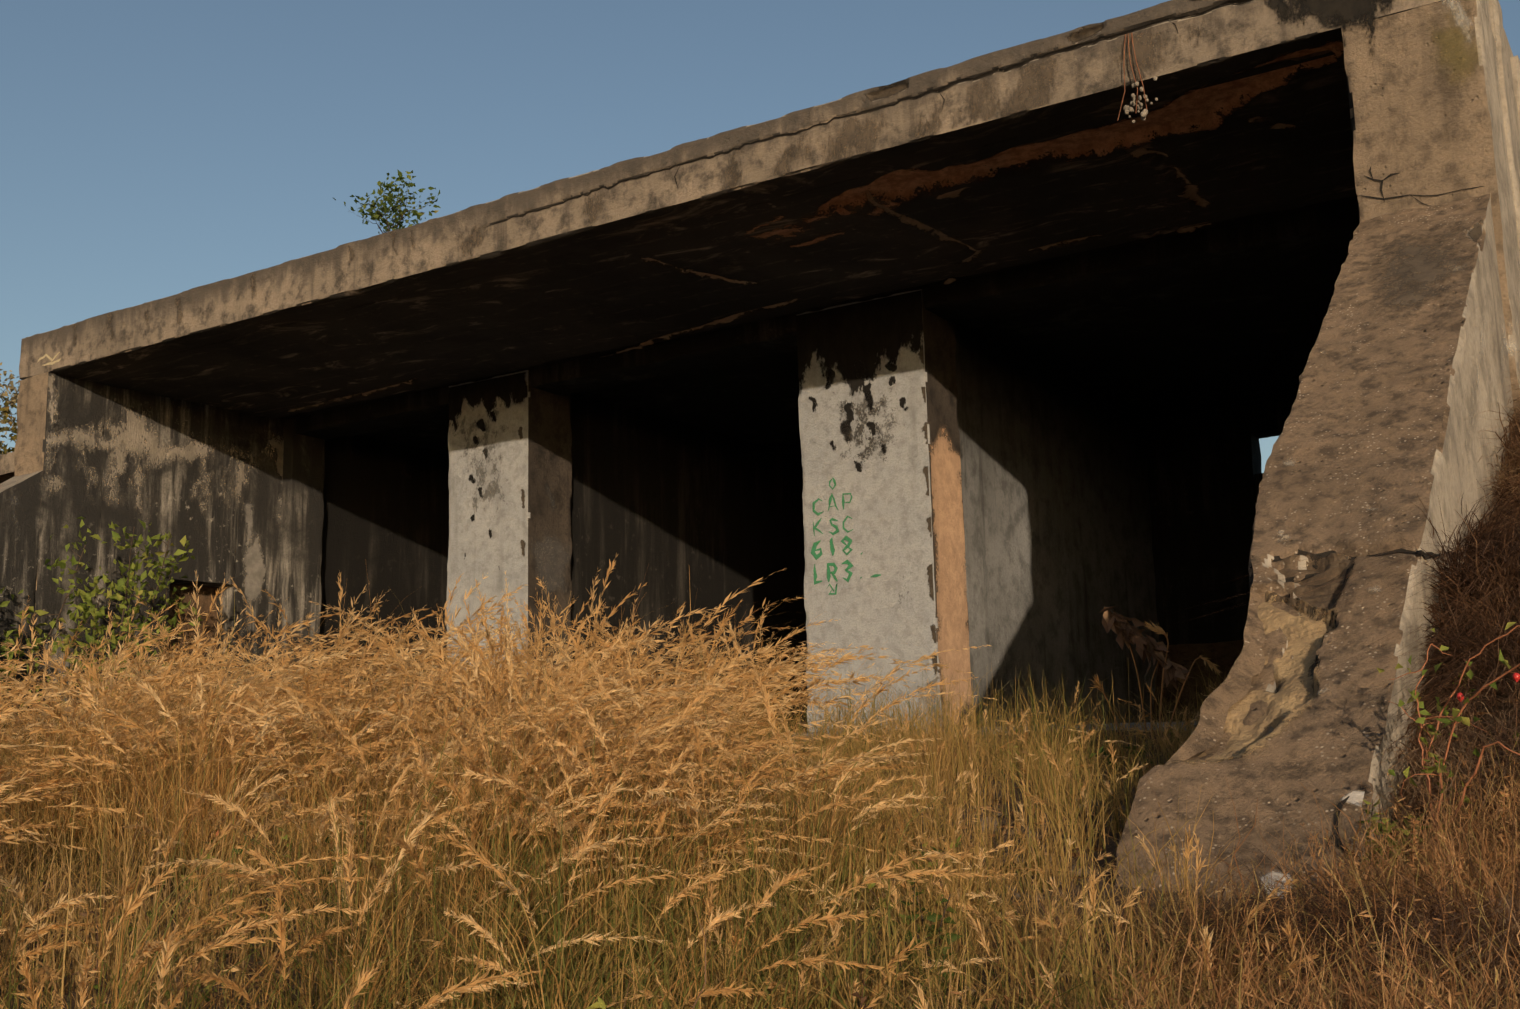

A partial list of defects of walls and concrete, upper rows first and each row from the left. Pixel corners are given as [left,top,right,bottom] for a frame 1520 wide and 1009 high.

water stain [1264,0,1393,55]
crack [487,0,1252,227]
crack [1359,167,1482,206]
peeling [473,411,496,458]
peeling [809,370,835,412]
peeling [829,384,886,453]
peeling [885,362,926,411]
peeling [922,422,972,725]
crack [1250,548,1461,584]
spalling [1173,530,1356,765]